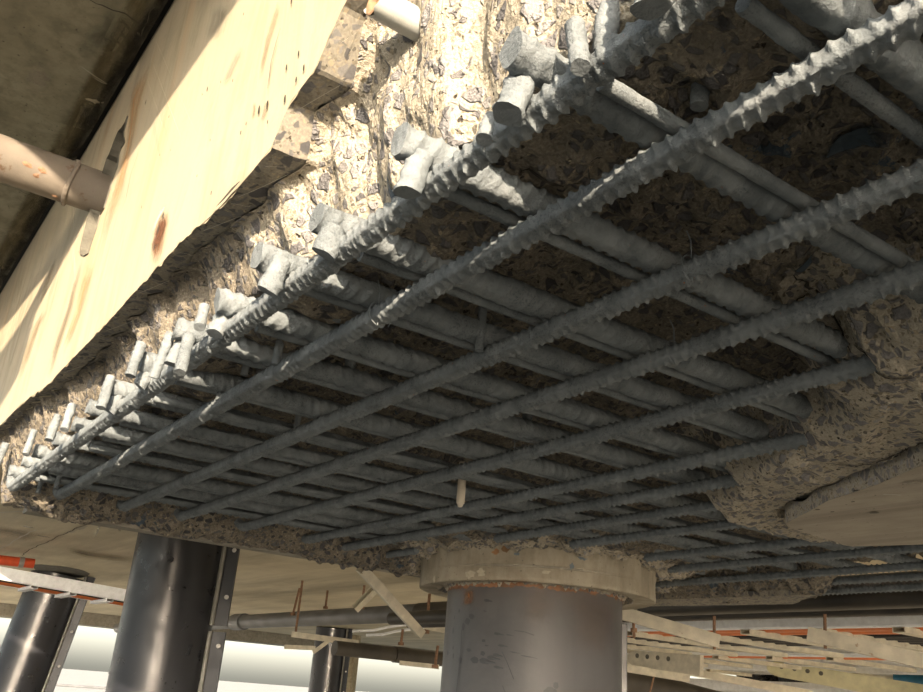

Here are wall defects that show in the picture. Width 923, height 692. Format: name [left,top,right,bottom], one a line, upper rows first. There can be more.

spalling [79,116,128,256]
corrosion [152,209,166,257]
spalling [105,395,123,416]
spalling [152,395,202,411]
spalling [312,470,389,491]
spalling [323,506,397,522]
spalling [358,498,428,514]
spalling [387,490,457,508]
spalling [465,485,501,500]
spalling [467,508,513,518]
spalling [596,481,653,494]
spalling [631,477,676,488]